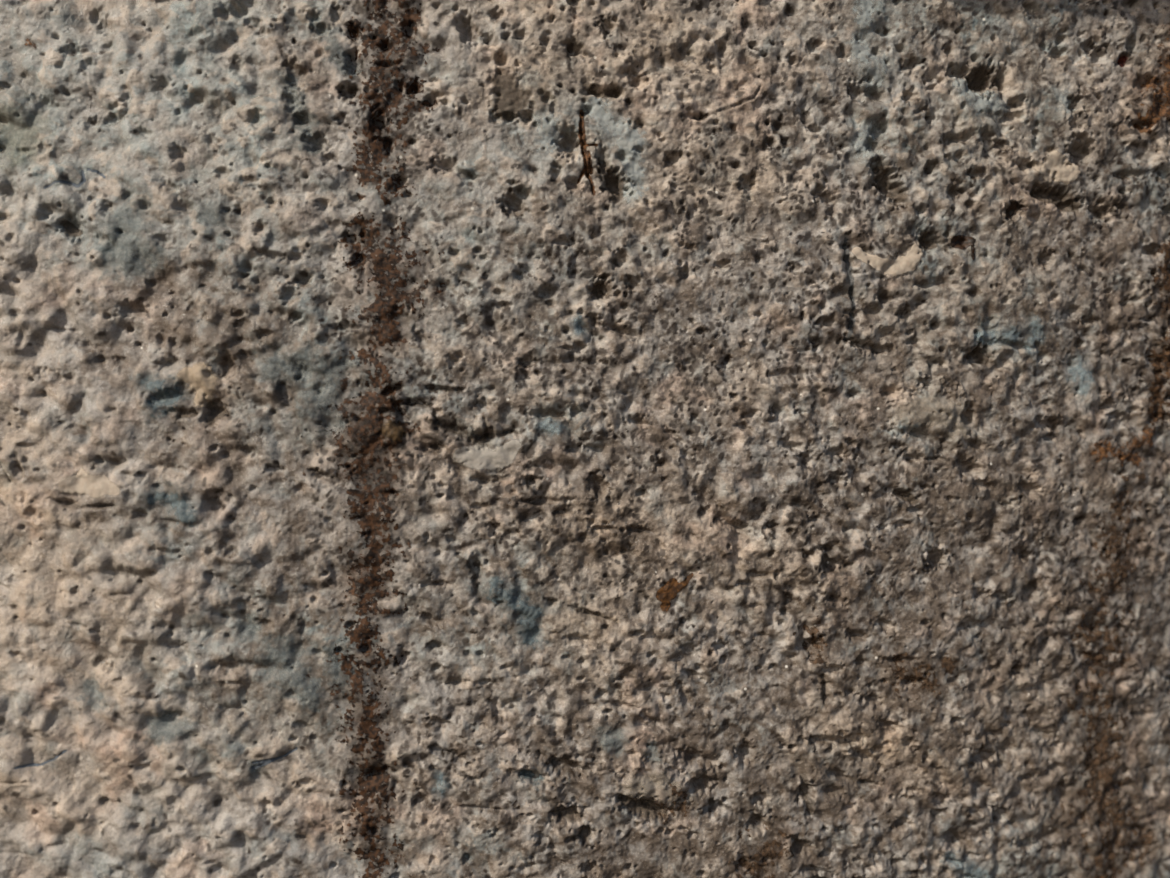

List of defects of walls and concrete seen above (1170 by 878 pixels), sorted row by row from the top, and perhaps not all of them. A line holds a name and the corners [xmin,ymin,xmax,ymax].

corrosion [320,0,445,878]